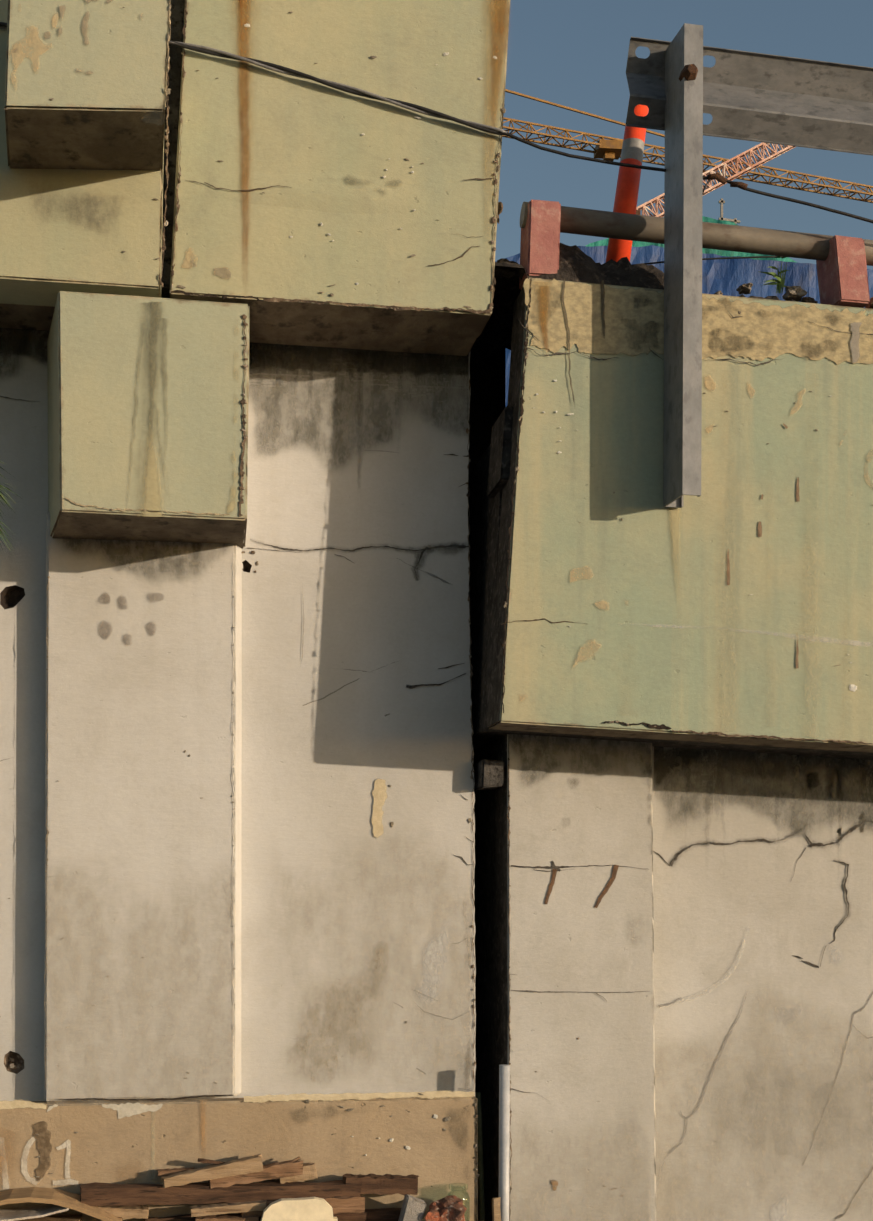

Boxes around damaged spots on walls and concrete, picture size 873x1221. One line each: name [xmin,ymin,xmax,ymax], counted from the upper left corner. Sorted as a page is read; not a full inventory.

corrosion [239,0,249,200]
crack [185,180,291,191]
spalling [702,294,873,364]
water stain [137,301,167,517]
water stain [249,342,469,463]
spalling [501,278,664,713]
spalling [0,585,25,609]
crack [250,539,469,584]
water stain [510,734,873,834]
corrosion [544,869,557,904]
corrosion [595,865,619,908]
crack [511,819,872,968]